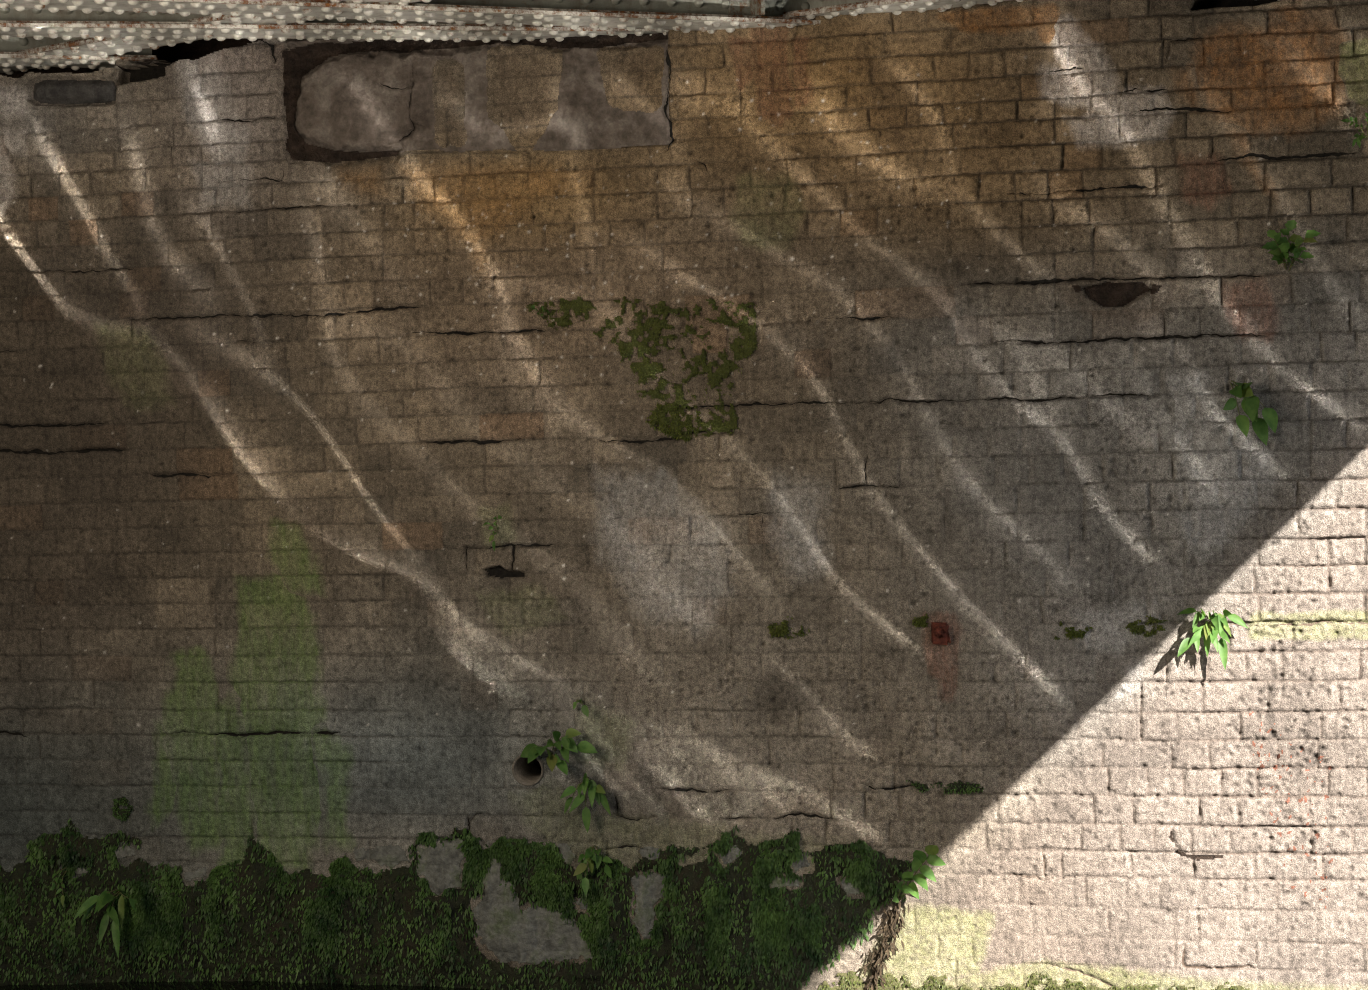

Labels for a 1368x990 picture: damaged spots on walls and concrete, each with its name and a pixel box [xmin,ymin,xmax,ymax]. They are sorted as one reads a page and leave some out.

crack [1119,37,1231,113]
crack [1216,152,1354,162]
crack [973,275,1260,285]
spalling [1072,282,1162,307]
crack [600,393,1148,444]
crack [0,421,128,455]
crack [422,437,522,445]
rust [916,608,966,706]
crack [175,730,341,738]
leakage [139,638,258,869]
leakage [311,722,364,860]
crack [659,788,740,820]